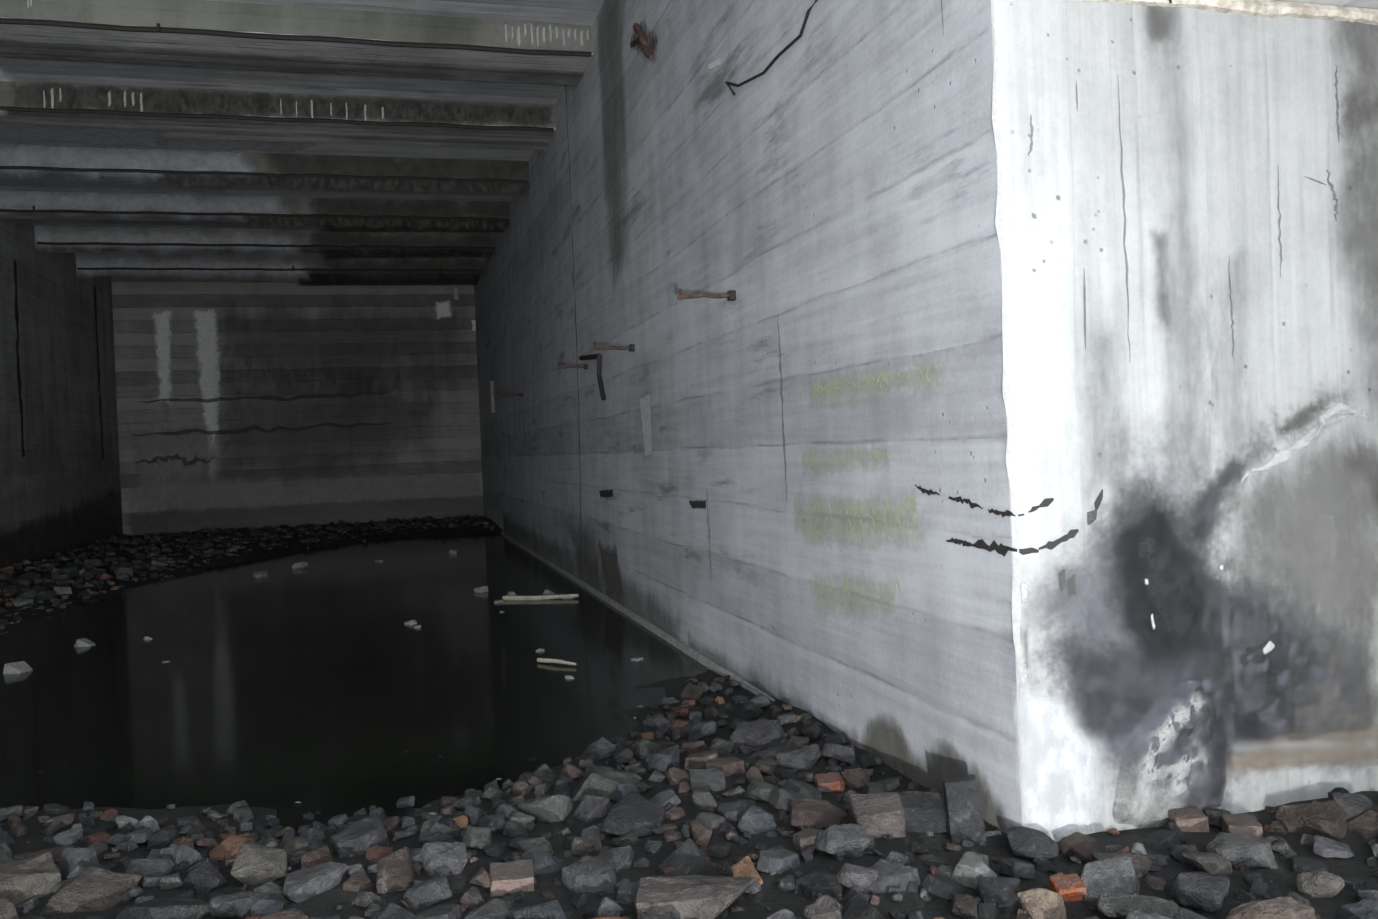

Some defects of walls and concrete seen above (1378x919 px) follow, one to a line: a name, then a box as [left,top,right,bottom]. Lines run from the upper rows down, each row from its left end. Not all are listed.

crack [914,485,1103,557]